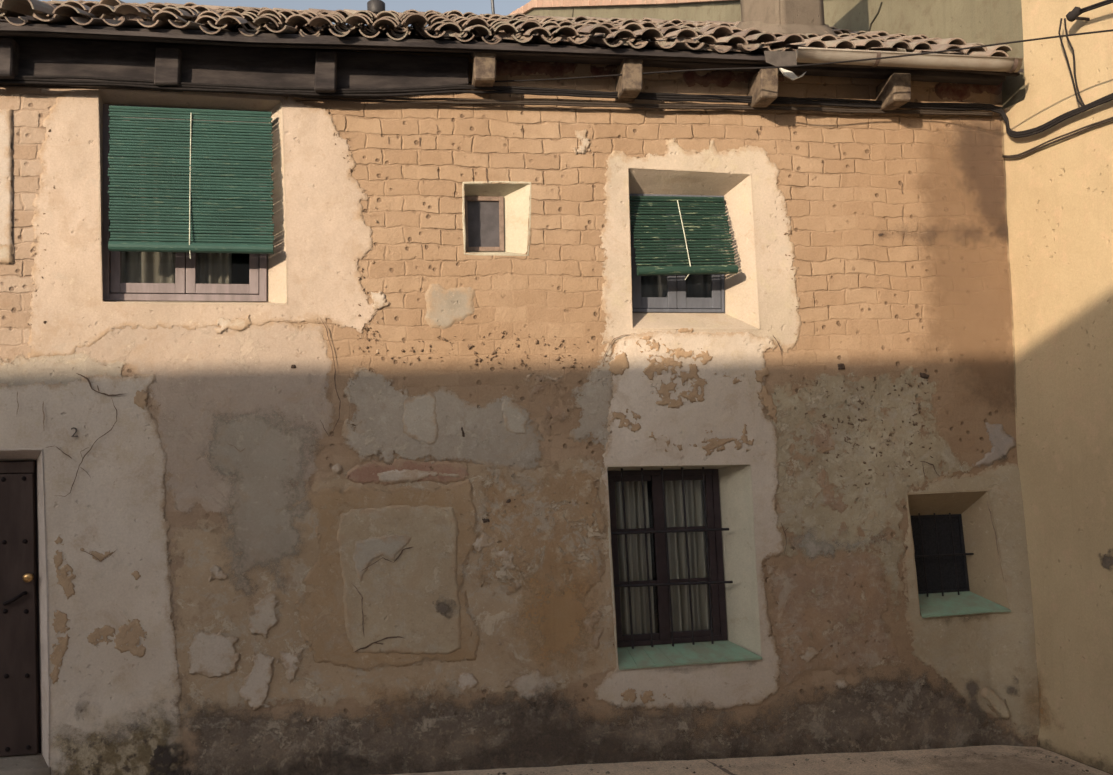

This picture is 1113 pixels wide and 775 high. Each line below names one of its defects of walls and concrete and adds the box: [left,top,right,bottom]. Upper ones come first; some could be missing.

damp [923,137,1017,405]
crack [17,373,123,497]
flaking render [72,315,471,519]
peeling [608,351,629,376]
peeling [609,409,754,456]
peeling [636,335,778,427]
flaking render [799,374,933,542]
peeling [49,610,70,684]
peeling [53,536,76,599]
peeling [87,619,147,657]
crack [352,547,412,652]
damp [53,671,1113,775]